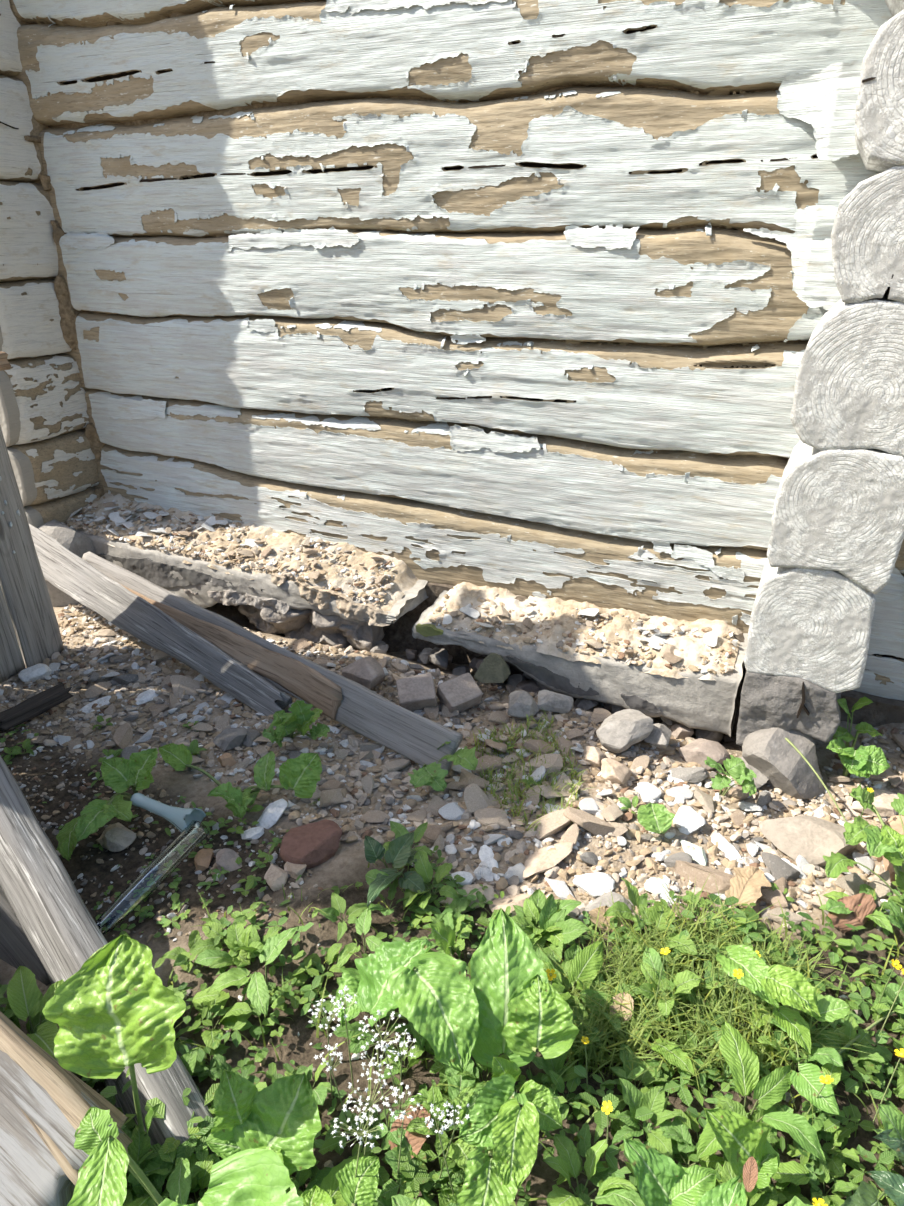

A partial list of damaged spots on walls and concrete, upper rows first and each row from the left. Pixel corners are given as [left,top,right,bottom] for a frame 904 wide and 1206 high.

peeling [17,0,539,73]
crack [60,69,172,85]
peeling [60,40,863,199]
crack [76,166,377,191]
peeling [140,172,564,252]
crack [443,162,584,171]
crack [629,155,818,174]
peeling [247,166,841,383]
peeling [107,397,779,485]
peeling [300,490,745,583]
peeling [549,583,741,626]
crack [797,682,810,718]